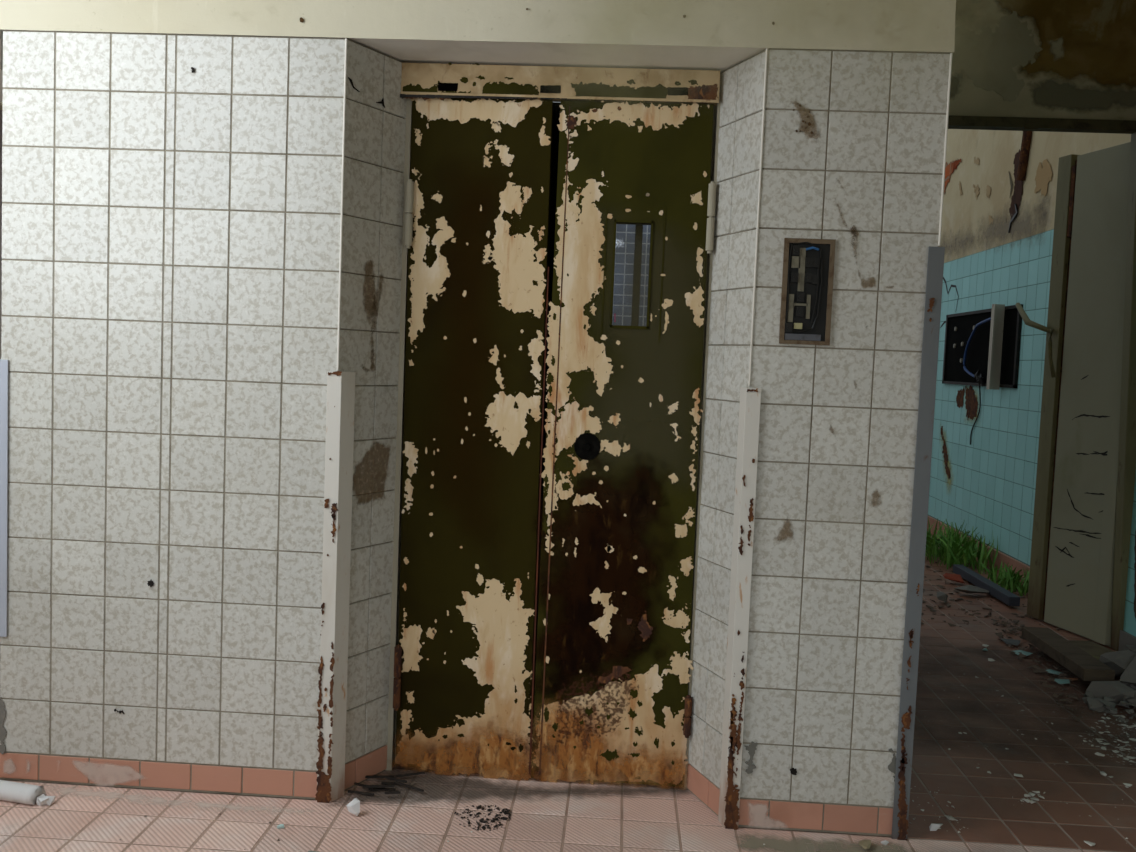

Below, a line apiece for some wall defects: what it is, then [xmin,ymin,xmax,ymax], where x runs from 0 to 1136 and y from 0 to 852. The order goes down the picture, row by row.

spalling [944,157,991,199]
peeling [1009,149,1053,219]
peeling [408,97,709,557]
corrosion [324,499,339,556]
corrosion [353,443,390,503]
peeling [401,438,439,514]
corrosion [399,267,686,787]
corrosion [738,498,754,555]
corrosion [315,603,335,803]
peeling [395,556,694,785]
corrosion [724,652,745,830]
corrosion [897,705,912,841]